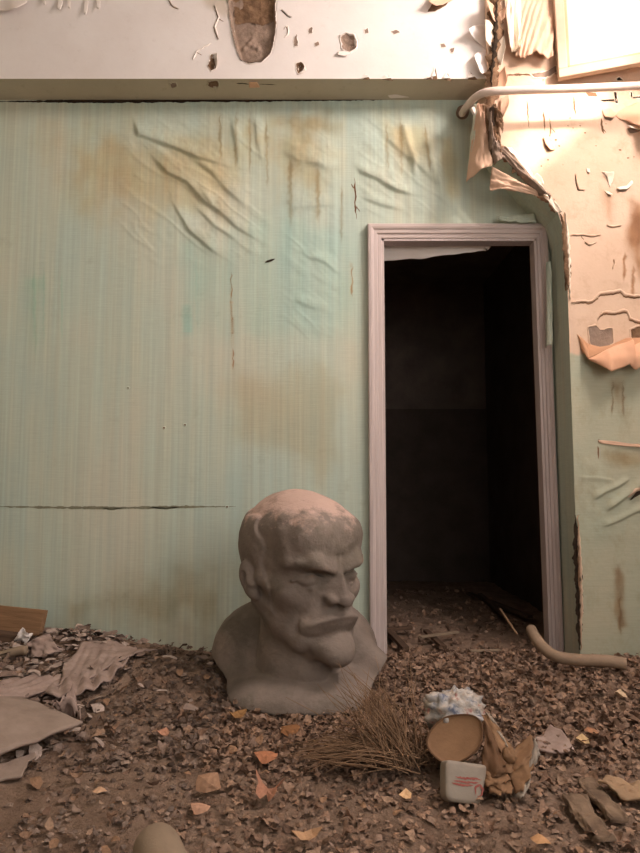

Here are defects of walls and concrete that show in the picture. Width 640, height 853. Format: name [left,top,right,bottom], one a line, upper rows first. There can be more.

flaking render [228,0,277,65]
flaking render [337,28,369,56]
flaking render [467,0,510,116]
flaking render [530,65,557,79]
peeling [585,76,624,121]
peeling [534,136,560,185]
peeling [601,171,633,196]
peeling [545,262,553,346]
peeling [573,289,640,305]
flaking render [587,309,640,347]
crack [0,503,236,511]